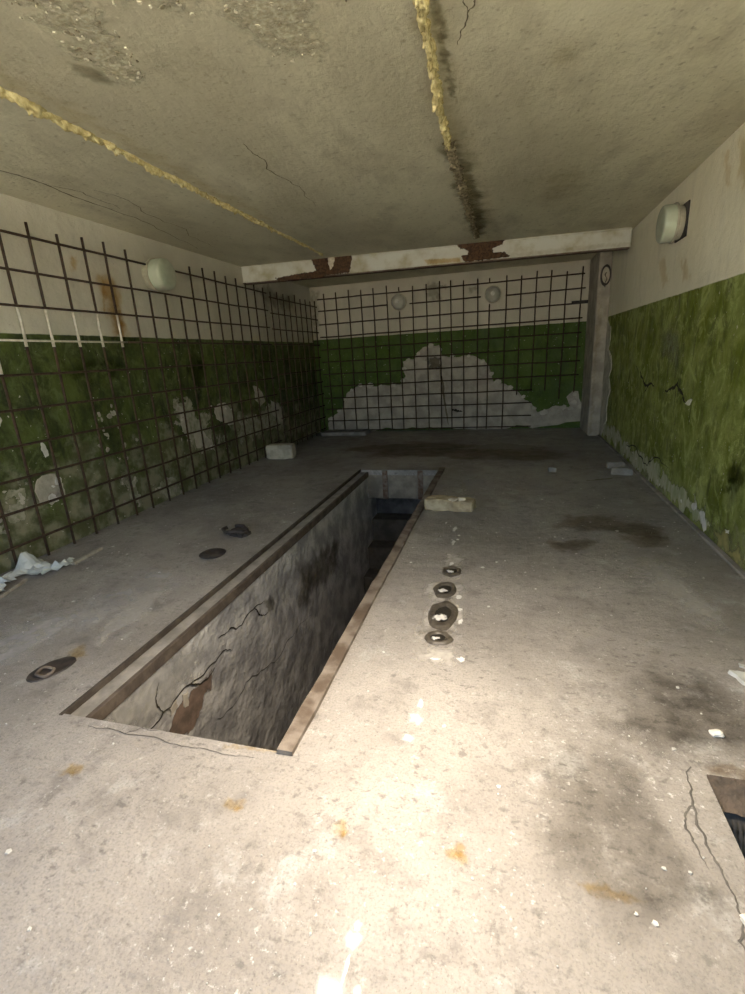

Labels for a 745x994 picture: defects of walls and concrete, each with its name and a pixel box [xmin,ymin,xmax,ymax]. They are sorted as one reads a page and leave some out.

spalling [11,0,143,86]
spalling [224,0,320,65]
crack [457,0,475,45]
crack [0,170,213,247]
rust [275,255,352,281]
rust [458,240,510,262]
spalling [0,222,586,566]
crack [90,601,268,758]
crack [218,615,311,719]
crack [684,767,745,950]